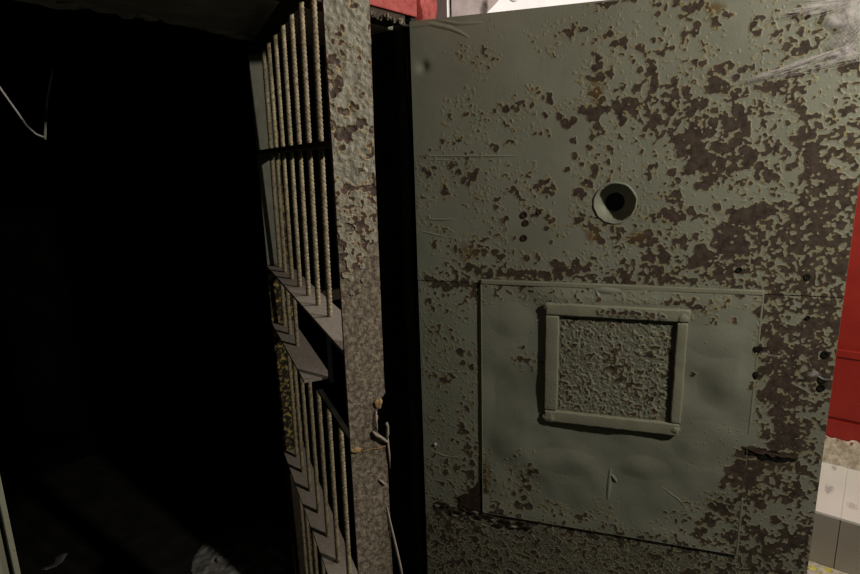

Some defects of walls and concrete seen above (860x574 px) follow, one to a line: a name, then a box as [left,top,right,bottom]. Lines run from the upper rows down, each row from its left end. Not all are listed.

peeling [323,0,405,295]
peeling [415,0,860,305]
peeling [619,210,747,327]
peeling [421,336,485,449]
peeling [559,317,673,420]
peeling [427,496,675,574]
peeling [714,435,860,574]